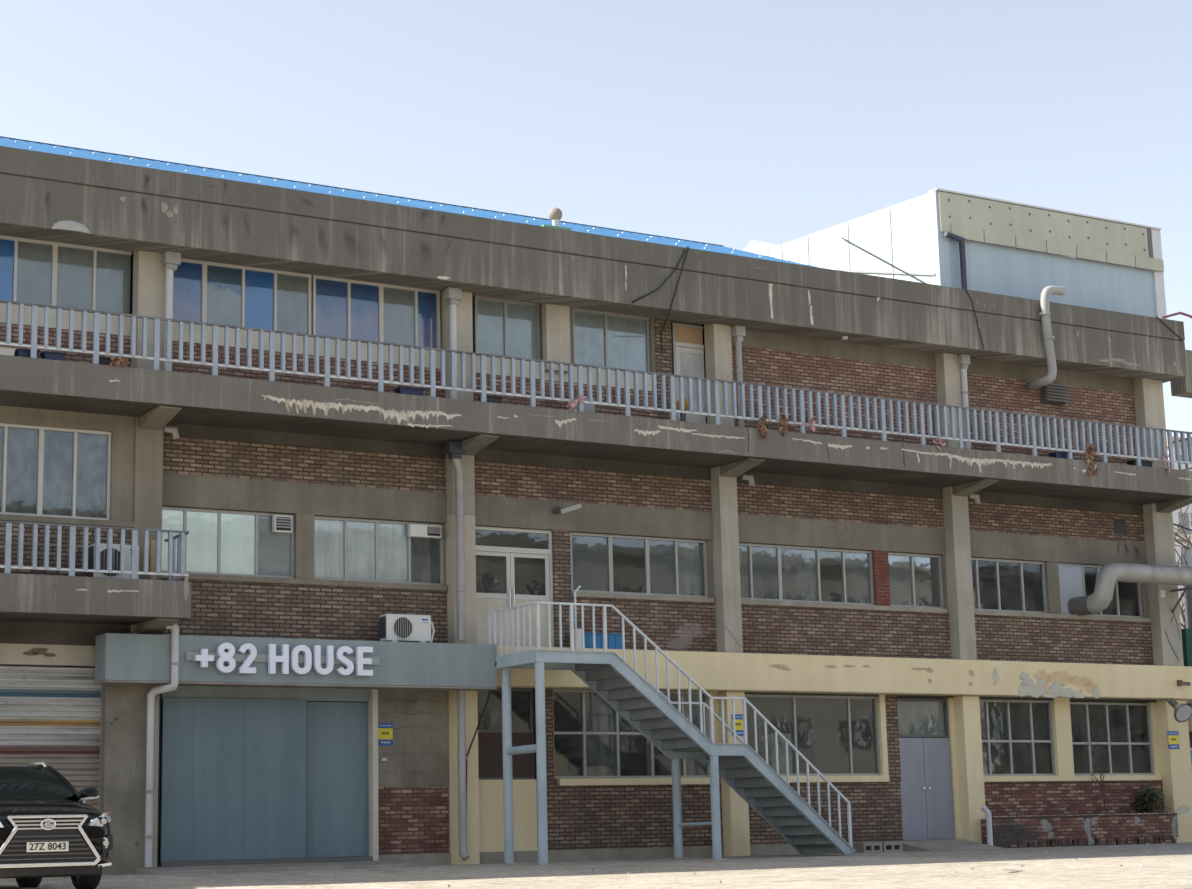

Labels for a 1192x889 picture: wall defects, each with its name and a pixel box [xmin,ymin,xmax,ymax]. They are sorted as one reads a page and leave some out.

peeling [1019,672,1100,698]